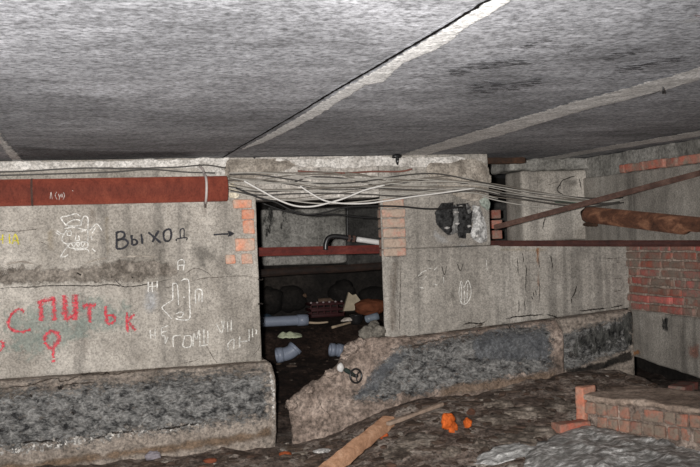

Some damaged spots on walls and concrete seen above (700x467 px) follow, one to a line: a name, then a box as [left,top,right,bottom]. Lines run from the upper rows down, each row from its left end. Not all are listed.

crack [222,0,490,158]
flaking render [242,0,510,149]
crack [1,268,256,289]